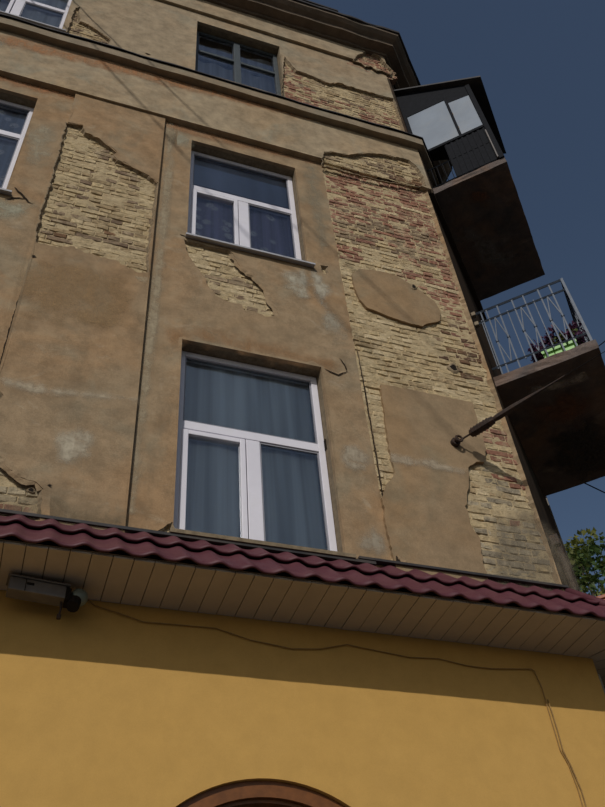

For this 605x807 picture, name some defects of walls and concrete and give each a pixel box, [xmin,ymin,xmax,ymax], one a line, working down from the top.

flaking render [67,8,111,44]
flaking render [281,58,404,131]
flaking render [347,52,397,85]
flaking render [35,121,160,273]
flaking render [184,240,278,317]
crack [0,295,20,364]
flaking render [320,151,559,599]
crack [325,348,383,496]
flaking render [0,457,52,520]